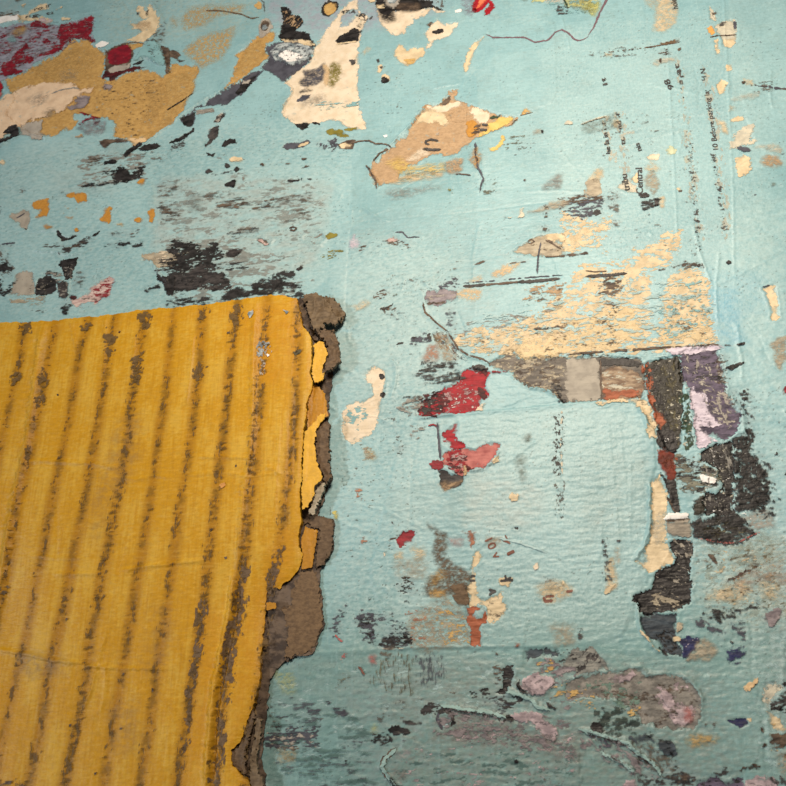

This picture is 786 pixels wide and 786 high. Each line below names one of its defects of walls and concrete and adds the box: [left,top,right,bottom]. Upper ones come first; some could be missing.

peeling [455,0,495,16]
peeling [0,39,199,146]
peeling [204,113,247,187]
peeling [283,140,310,150]
peeling [320,89,532,194]
peeling [771,336,786,369]
peeling [341,169,782,661]
peeling [380,616,786,786]